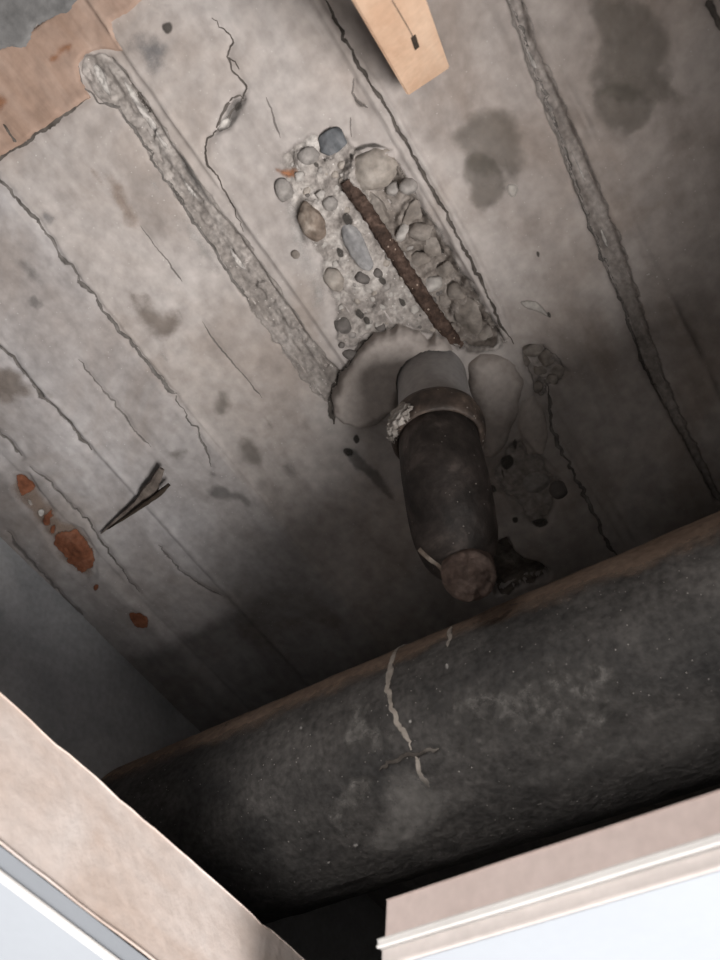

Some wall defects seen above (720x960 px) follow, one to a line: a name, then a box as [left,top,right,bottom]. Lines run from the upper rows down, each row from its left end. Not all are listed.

crack [705,0,720,30]
crack [204,18,280,230]
spalling [275,126,505,361]
crack [547,383,617,555]